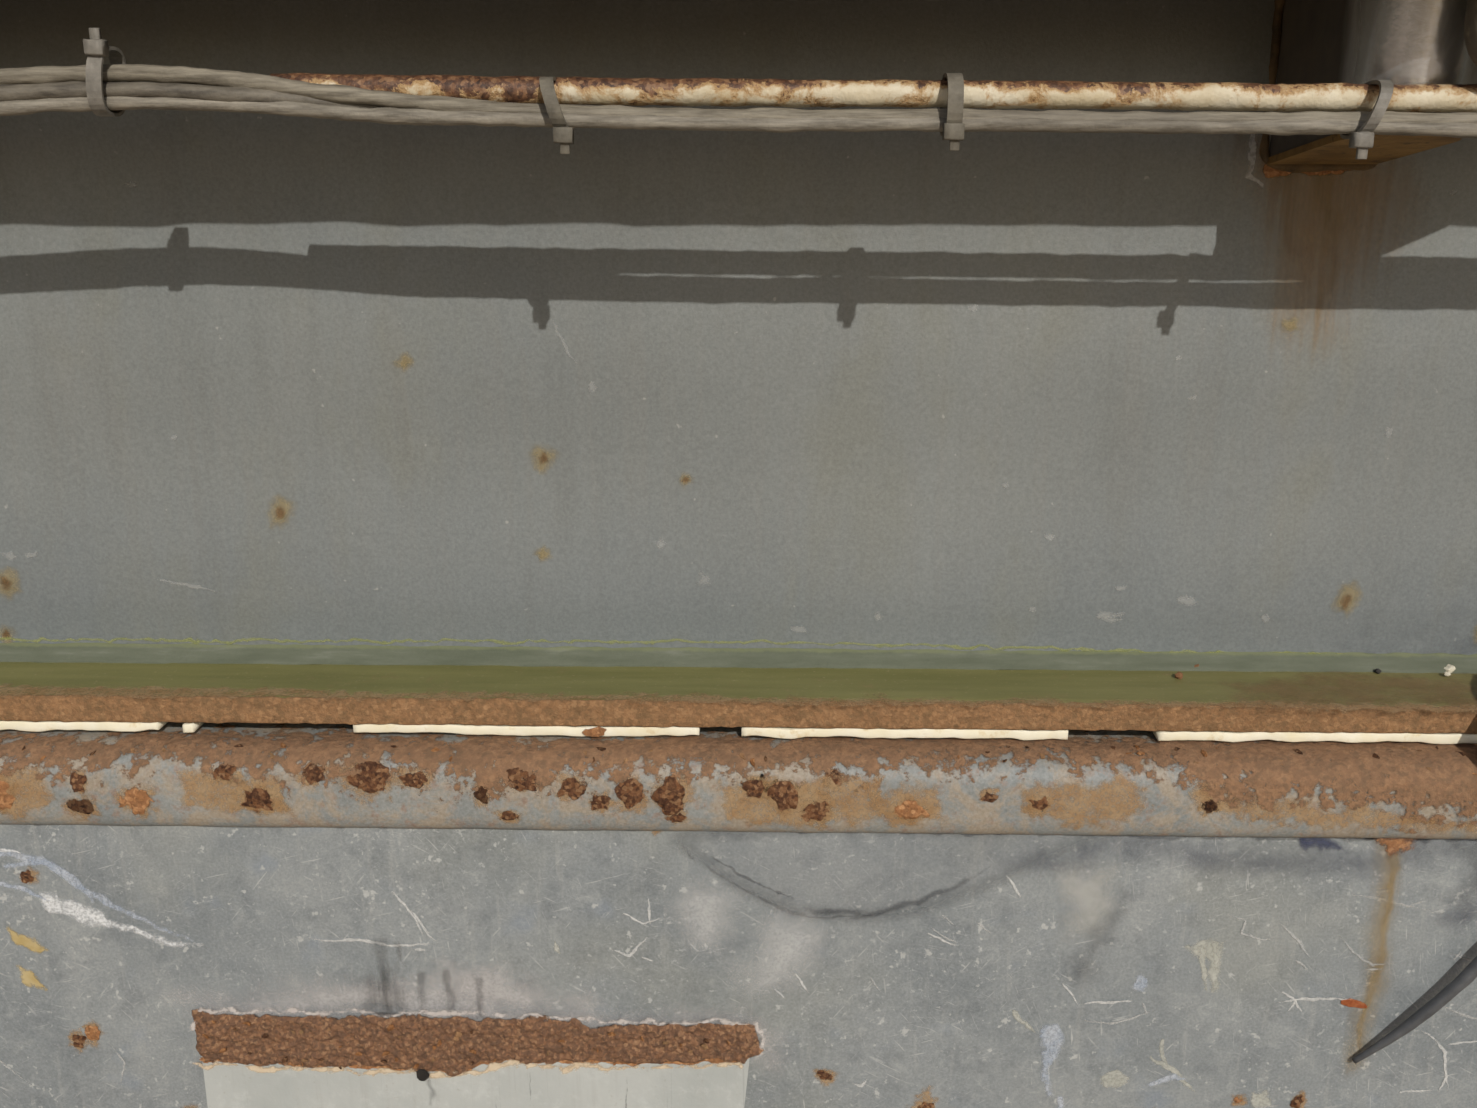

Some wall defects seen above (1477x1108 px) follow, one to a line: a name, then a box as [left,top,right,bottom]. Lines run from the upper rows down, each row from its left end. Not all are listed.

corrosion [0,723,1477,856]
corrosion [20,869,38,883]
corrosion [1341,998,1367,1009]
corrosion [68,1023,100,1050]
corrosion [815,1069,835,1085]
corrosion [912,1091,935,1108]
corrosion [1290,1092,1306,1108]